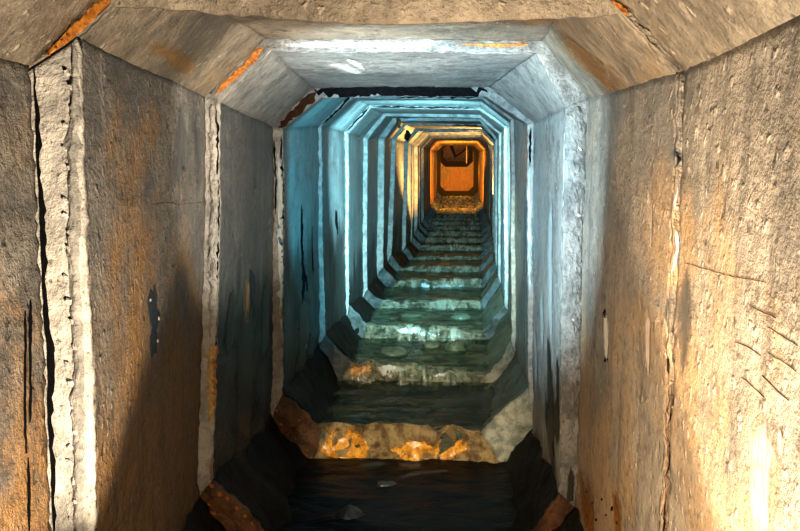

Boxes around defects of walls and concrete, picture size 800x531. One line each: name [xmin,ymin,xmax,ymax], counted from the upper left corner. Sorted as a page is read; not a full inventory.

corrosion [47,0,111,56]
corrosion [216,47,263,94]
crack [673,148,681,168]
crack [274,135,314,303]
crack [686,263,766,283]
crack [23,68,57,531]
spalling [147,284,160,359]
crack [750,306,798,346]
corrosion [349,365,371,376]
crack [741,375,789,401]
crack [735,342,796,372]
crack [660,394,673,531]